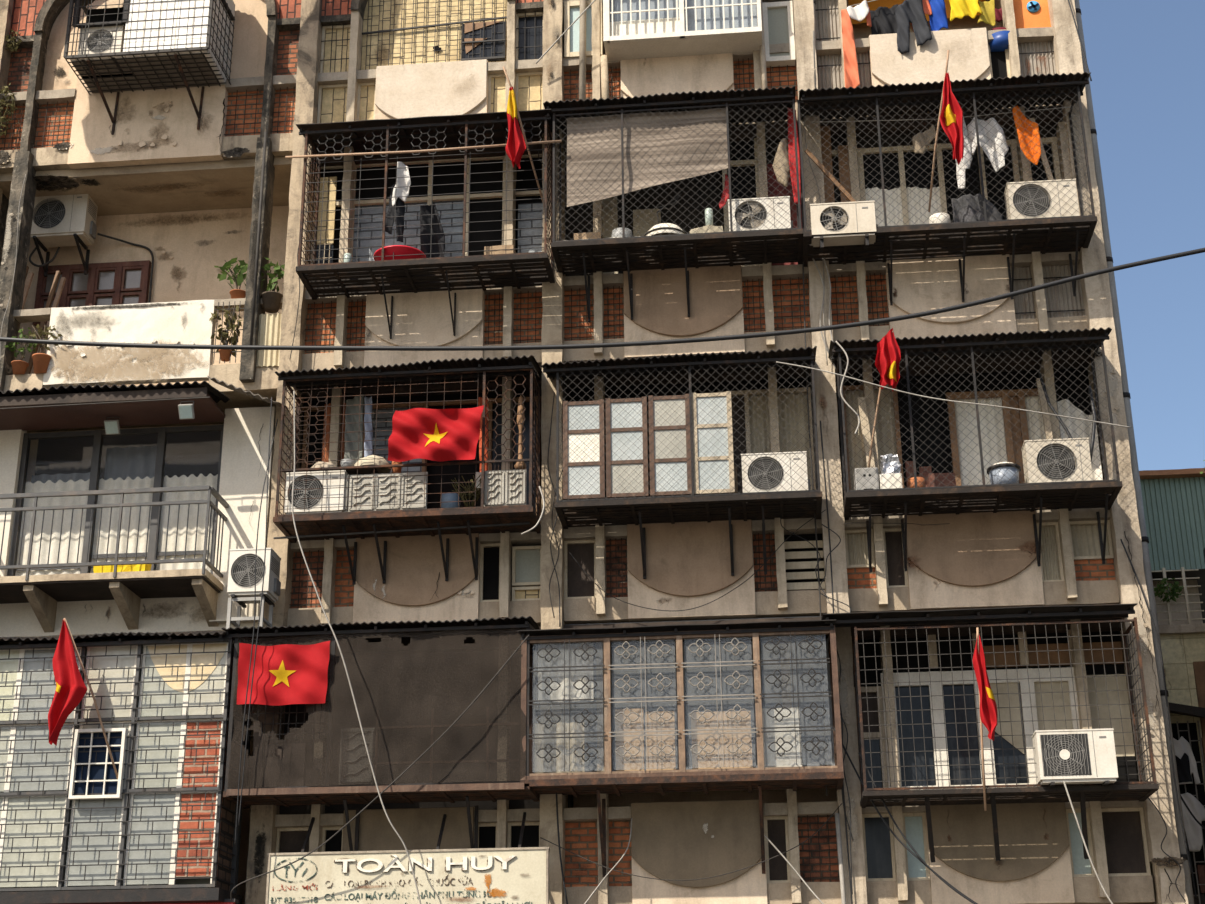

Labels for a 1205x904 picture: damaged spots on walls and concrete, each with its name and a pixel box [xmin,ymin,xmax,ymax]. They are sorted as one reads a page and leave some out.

peeling [50,338,203,383]